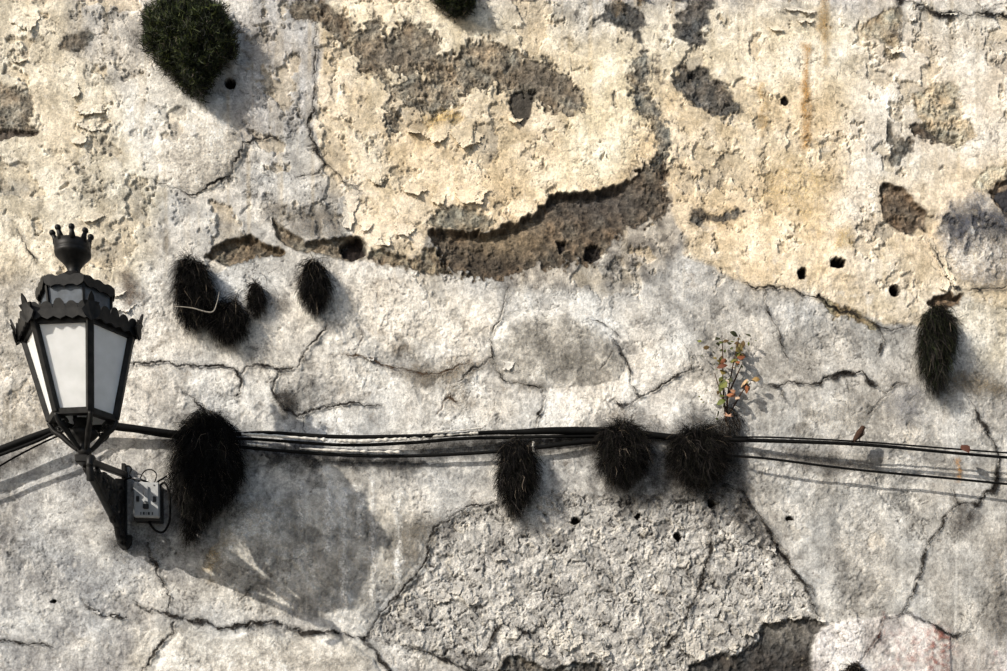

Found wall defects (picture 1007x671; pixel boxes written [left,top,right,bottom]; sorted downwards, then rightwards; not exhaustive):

spalling [0,84,39,141]
spalling [204,0,675,283]
spalling [673,0,714,47]
spalling [673,65,740,116]
corrosion [802,44,811,146]
spalling [879,182,963,310]
crack [133,287,545,431]
crack [588,318,693,407]
crack [736,275,906,412]
crack [81,500,531,671]
spalling [363,491,826,671]
crack [864,396,1001,657]